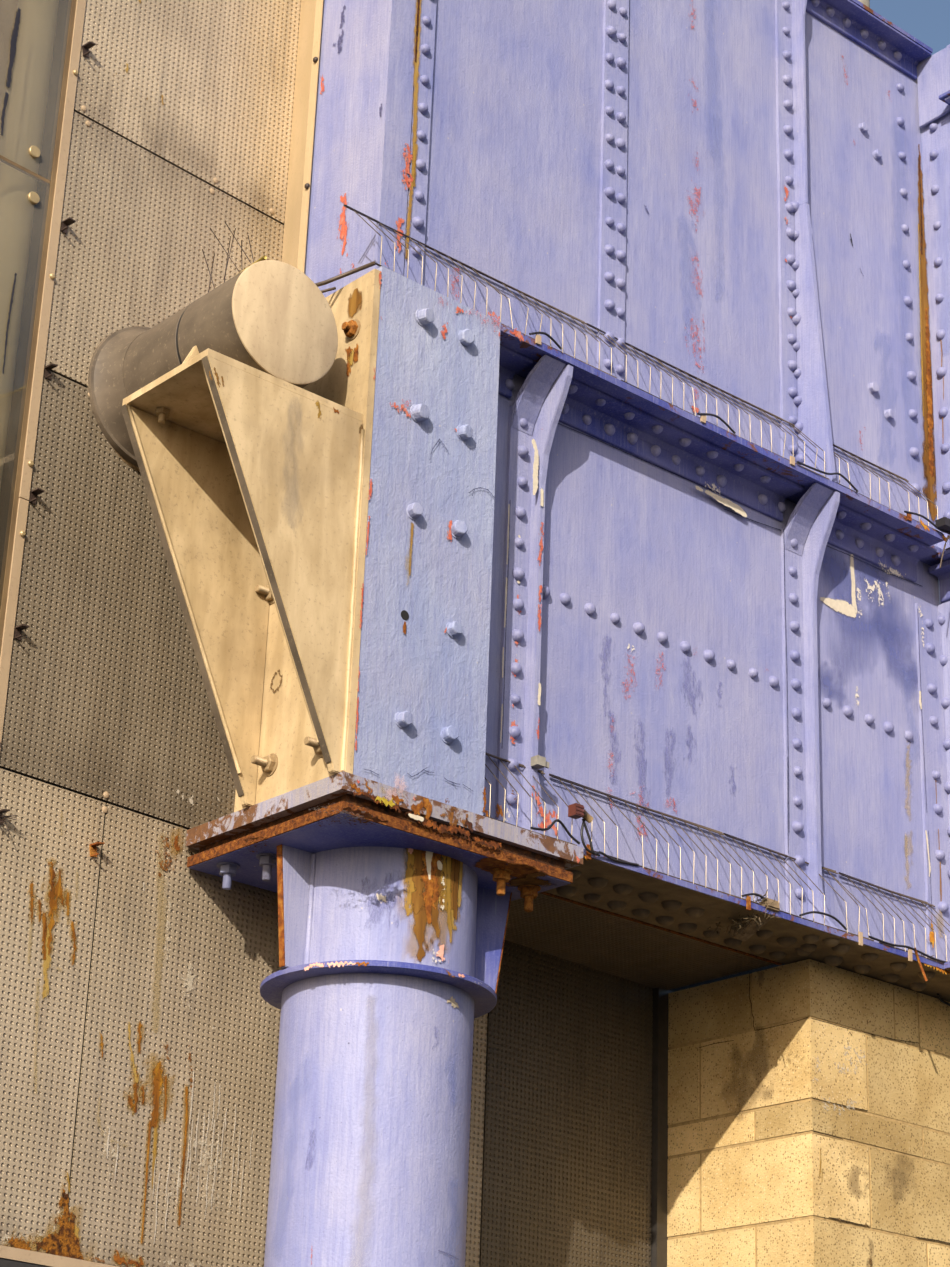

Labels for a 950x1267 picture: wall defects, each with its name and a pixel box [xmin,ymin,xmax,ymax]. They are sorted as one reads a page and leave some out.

rust [306,779,552,962]